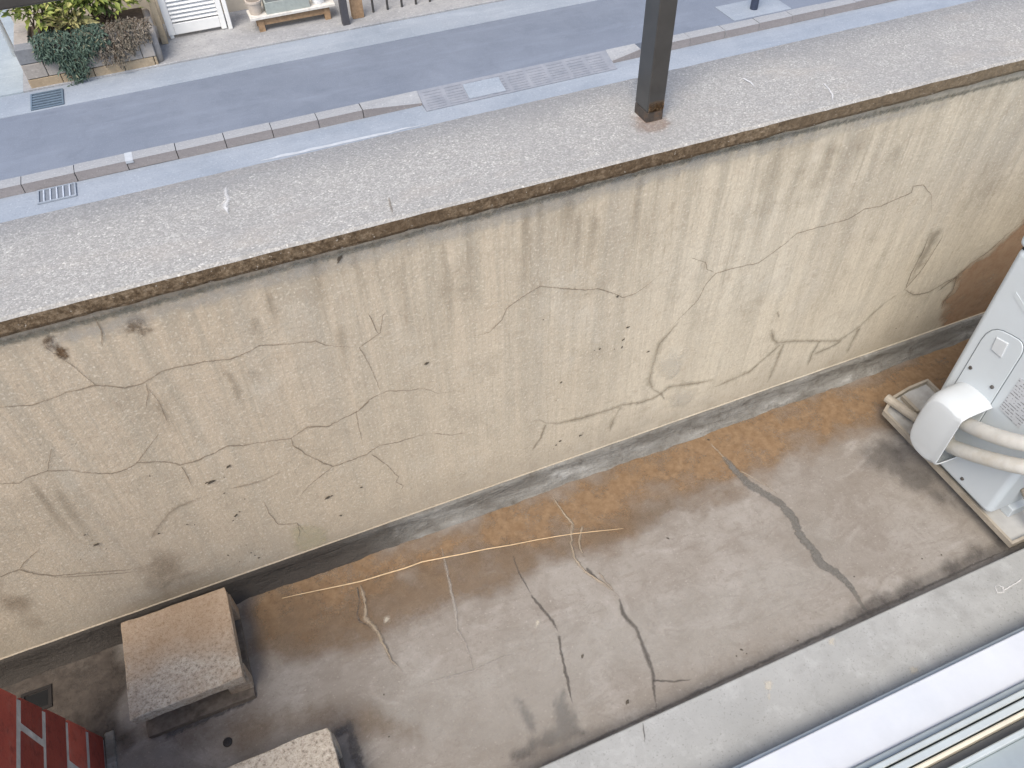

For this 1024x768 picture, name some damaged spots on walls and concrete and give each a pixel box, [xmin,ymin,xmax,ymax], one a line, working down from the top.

crack [906,241,1000,303]
crack [8,345,272,474]
crack [289,383,410,485]
crack [717,450,856,593]
crack [357,587,394,663]
crack [514,560,571,696]
crack [555,500,686,695]